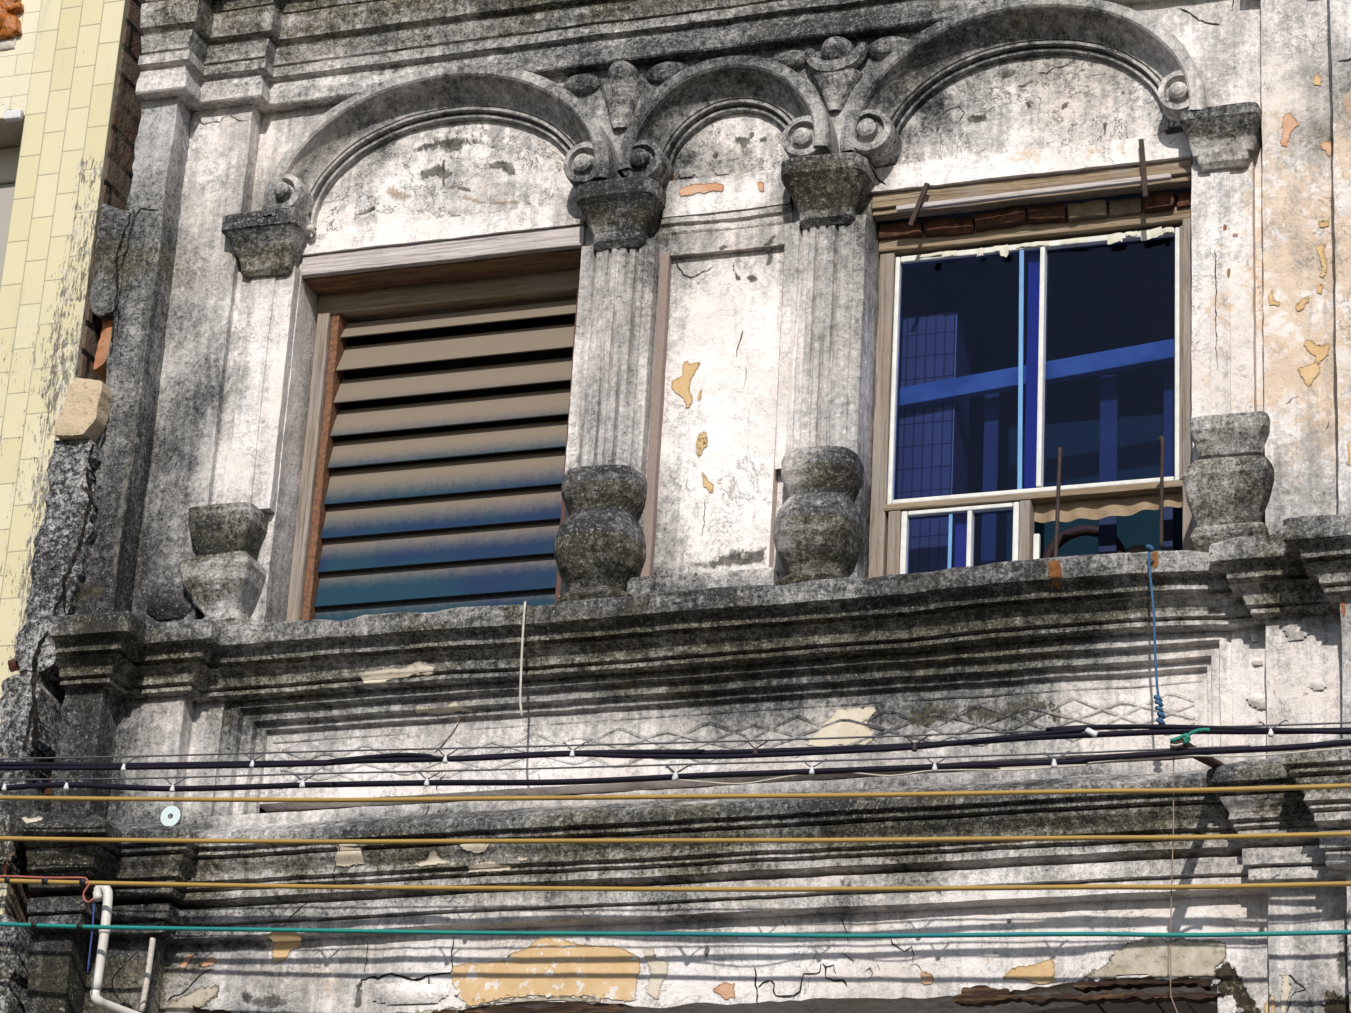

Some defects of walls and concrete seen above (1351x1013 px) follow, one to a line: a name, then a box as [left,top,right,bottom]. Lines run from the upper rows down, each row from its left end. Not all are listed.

peeling [671,361,702,407]
leakage [72,262,156,606]
peeling [696,432,708,456]
crack [22,419,109,762]
rust [1049,560,1062,589]
peeling [360,660,435,684]
peeling [806,706,876,747]
leakage [909,696,1066,727]
crack [360,938,454,984]
peeling [396,936,669,1013]
crack [754,917,922,1004]
spalling [953,937,1292,1013]